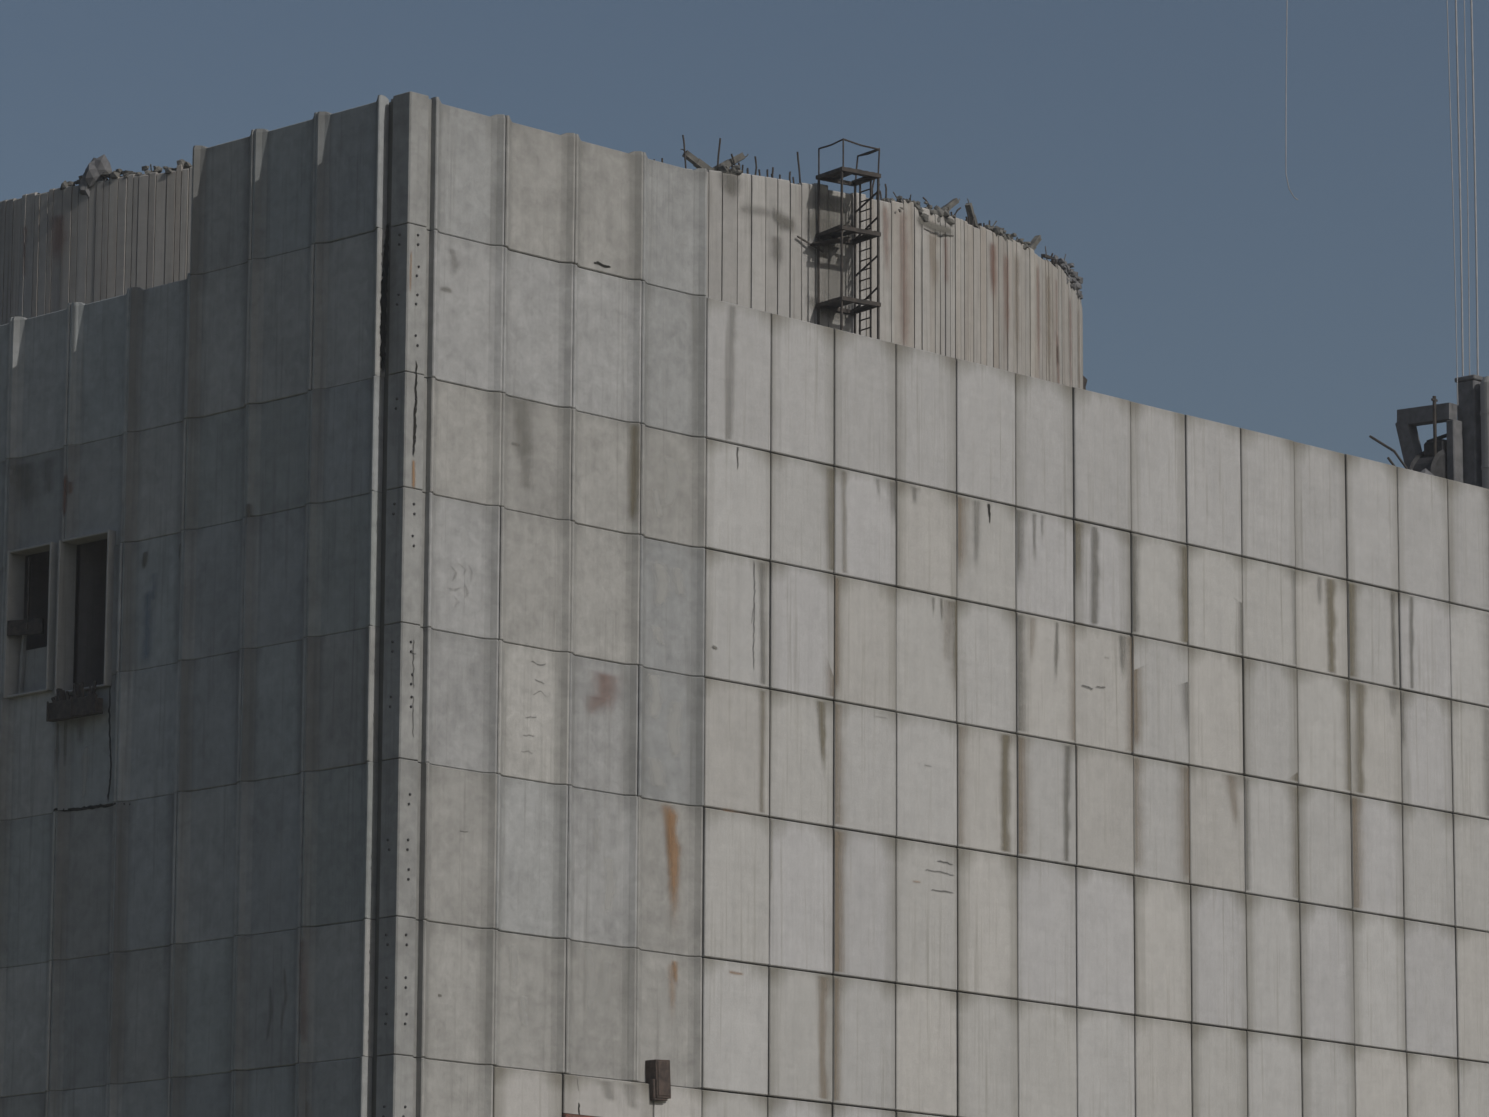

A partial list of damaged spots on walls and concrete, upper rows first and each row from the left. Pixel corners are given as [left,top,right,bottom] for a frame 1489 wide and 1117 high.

spalling [918,217,953,237]
crack [380,225,418,487]
water stain [1076,523,1099,623]
corrosion [668,812,678,897]
water stain [819,470,841,1100]
water stain [1002,615,1023,853]
water stain [1328,579,1363,907]